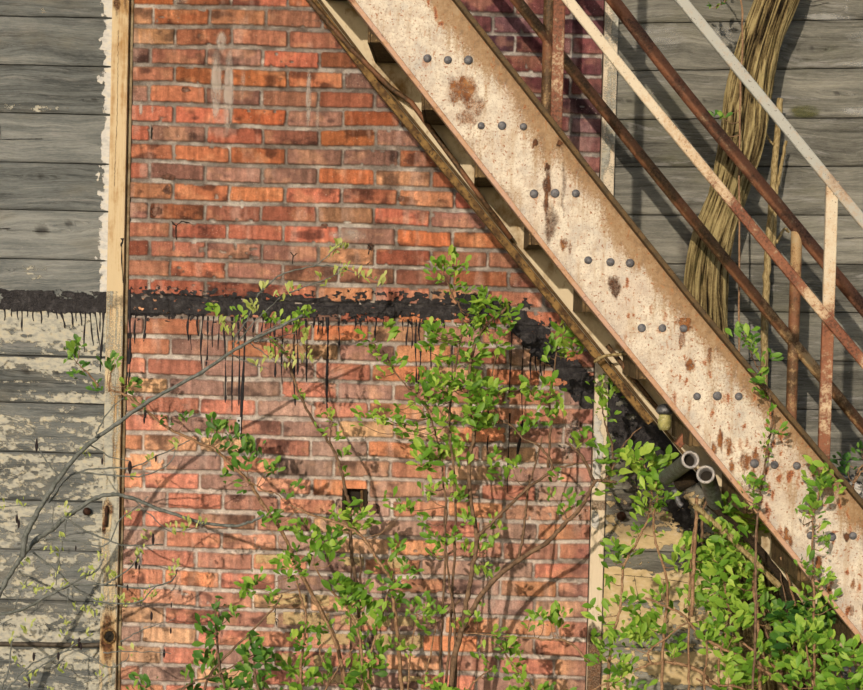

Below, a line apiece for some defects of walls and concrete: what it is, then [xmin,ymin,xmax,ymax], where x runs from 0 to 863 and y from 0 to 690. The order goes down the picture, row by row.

rust [450,76,484,123]
rust [543,163,571,250]
rust [608,277,621,298]
peeling [0,0,123,690]
rust [678,318,691,349]
rust [712,429,760,484]
peeling [844,476,863,499]